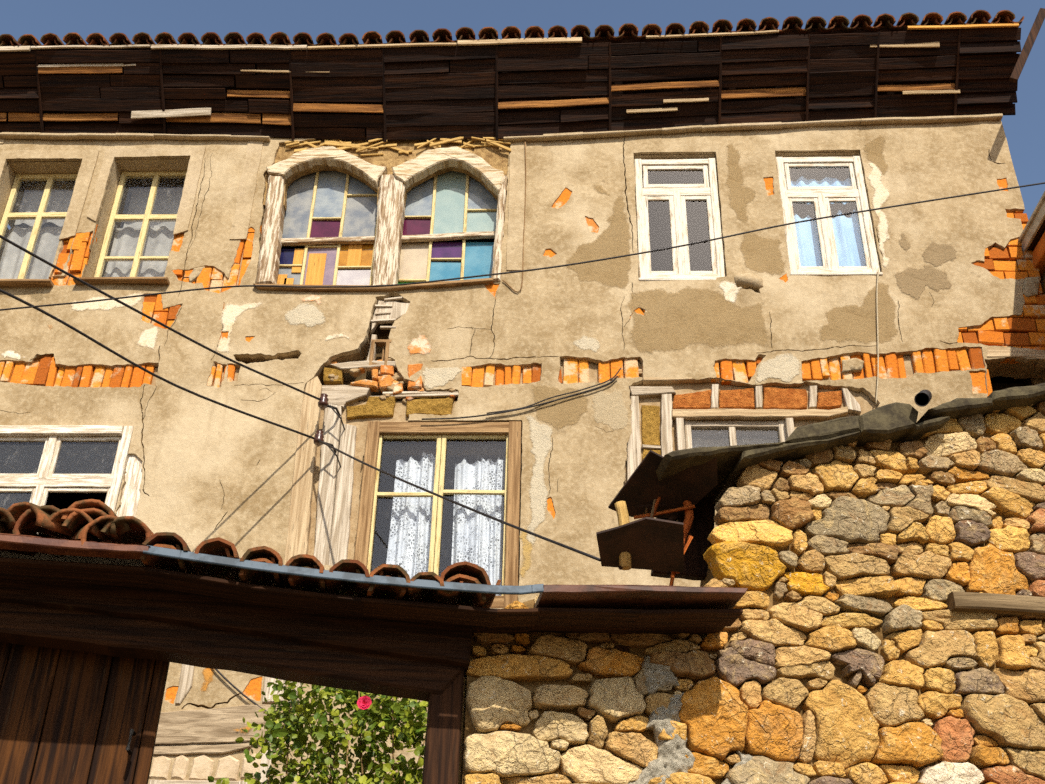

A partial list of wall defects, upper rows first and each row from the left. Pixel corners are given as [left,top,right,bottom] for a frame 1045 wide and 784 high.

flaking render [51,224,98,286]
flaking render [71,293,183,349]
flaking render [171,225,263,387]
flaking render [285,295,325,326]
flaking render [0,350,159,388]
flaking render [304,135,1045,577]
flaking render [116,453,143,517]